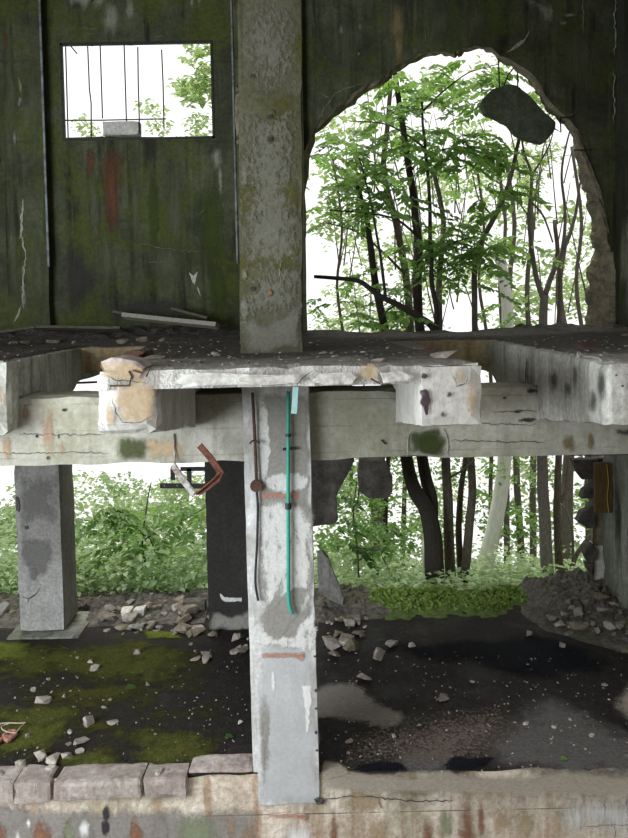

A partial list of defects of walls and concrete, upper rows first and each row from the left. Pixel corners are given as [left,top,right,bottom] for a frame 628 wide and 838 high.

spalling [571,128,610,234]
damp [589,375,604,411]
damp [22,541,51,580]
rust [102,806,110,835]
rust [130,823,142,838]
crack [324,795,452,806]
rust [459,807,483,838]
crack [588,795,628,838]